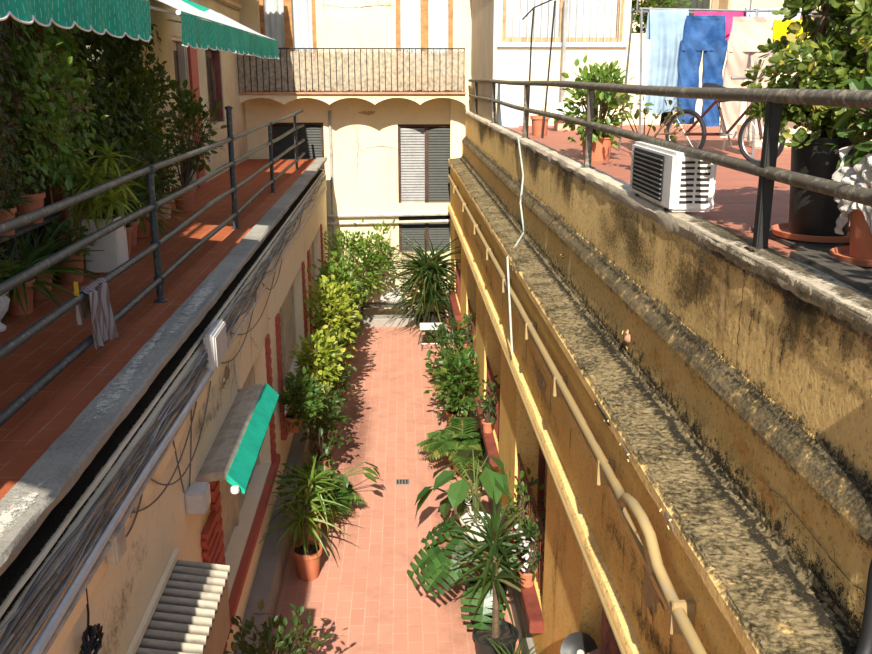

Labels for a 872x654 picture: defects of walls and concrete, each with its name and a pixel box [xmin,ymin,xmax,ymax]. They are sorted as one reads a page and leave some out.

water stain [462,121,872,557]
water stain [632,600,675,654]